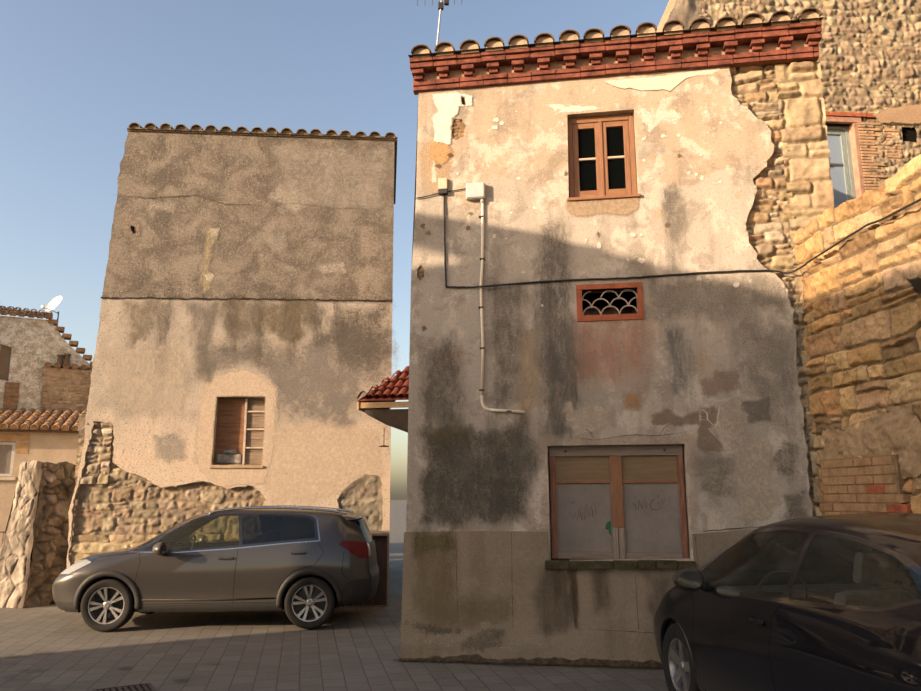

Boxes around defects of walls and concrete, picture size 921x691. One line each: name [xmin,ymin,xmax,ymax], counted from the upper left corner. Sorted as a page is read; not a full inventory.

peeling [429,92,472,183]
crack [610,74,709,92]
damp [190,298,389,425]
spalling [604,64,819,516]
spalling [69,414,266,566]
damp [415,339,537,554]